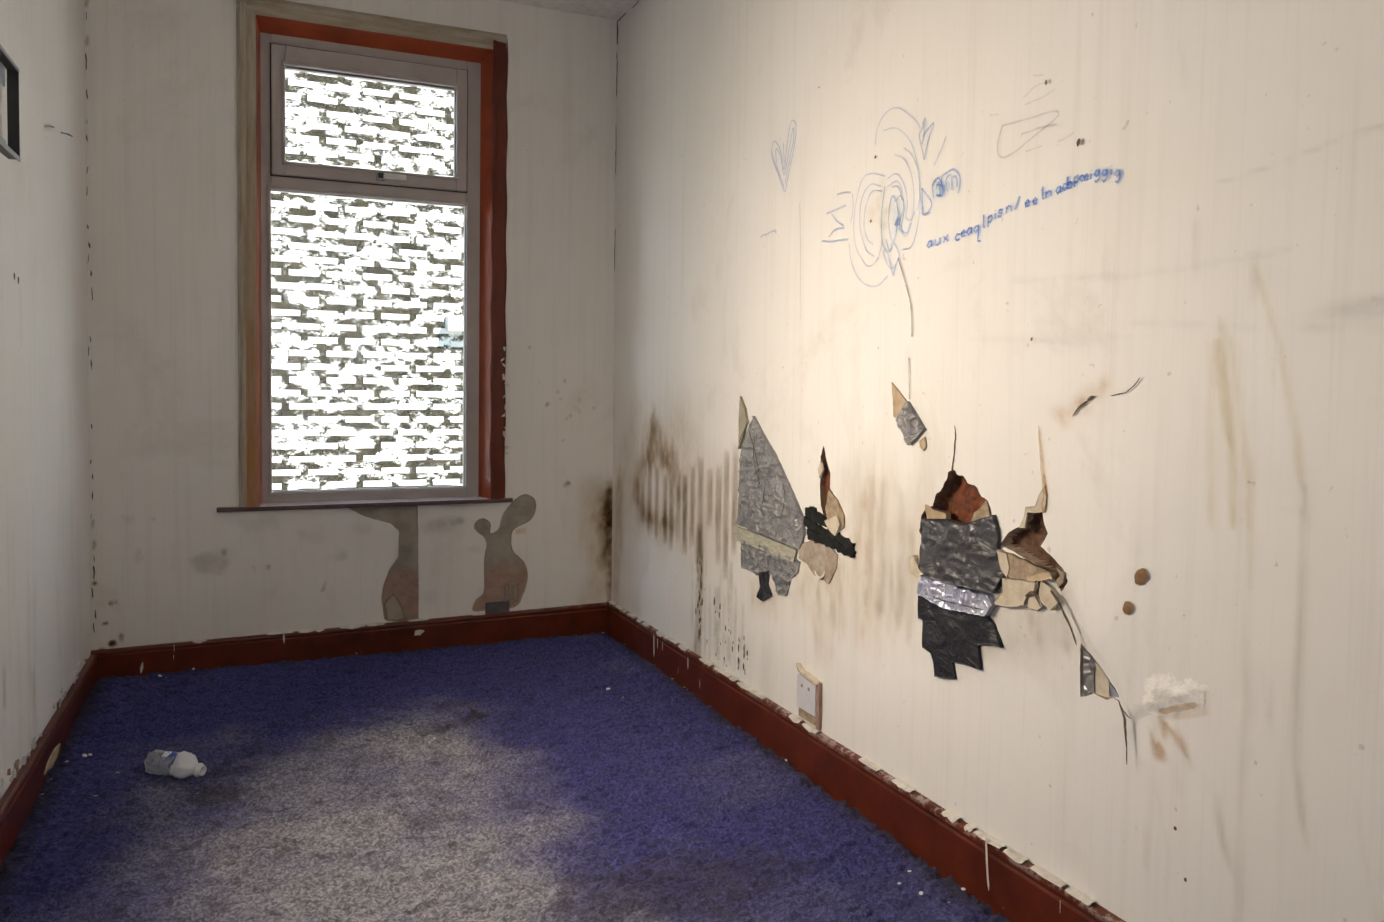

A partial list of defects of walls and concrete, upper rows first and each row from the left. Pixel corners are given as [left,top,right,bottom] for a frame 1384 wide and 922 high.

peeling [267,506,429,635]
peeling [472,494,536,616]
peeling [798,446,845,584]
flaking render [919,470,992,534]
flaking render [994,485,1068,610]
crack [1025,581,1077,645]
spalling [1080,644,1119,700]
crack [1114,698,1131,765]